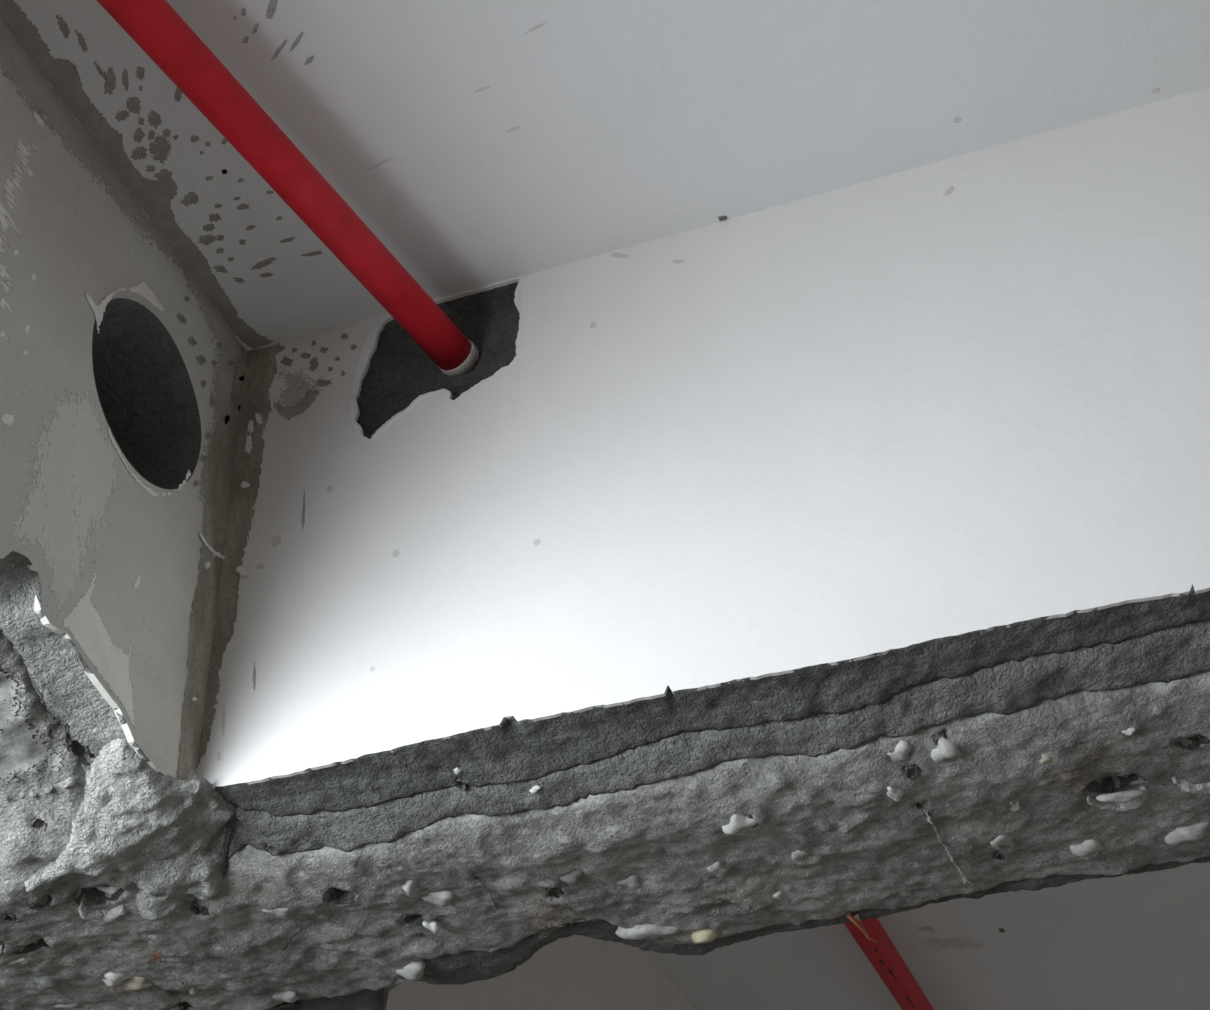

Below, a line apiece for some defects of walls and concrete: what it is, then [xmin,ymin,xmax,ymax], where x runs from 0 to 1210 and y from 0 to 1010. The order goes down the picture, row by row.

spalling [85,281,244,406]
flaking render [348,276,527,441]
spalling [0,374,1210,1010]